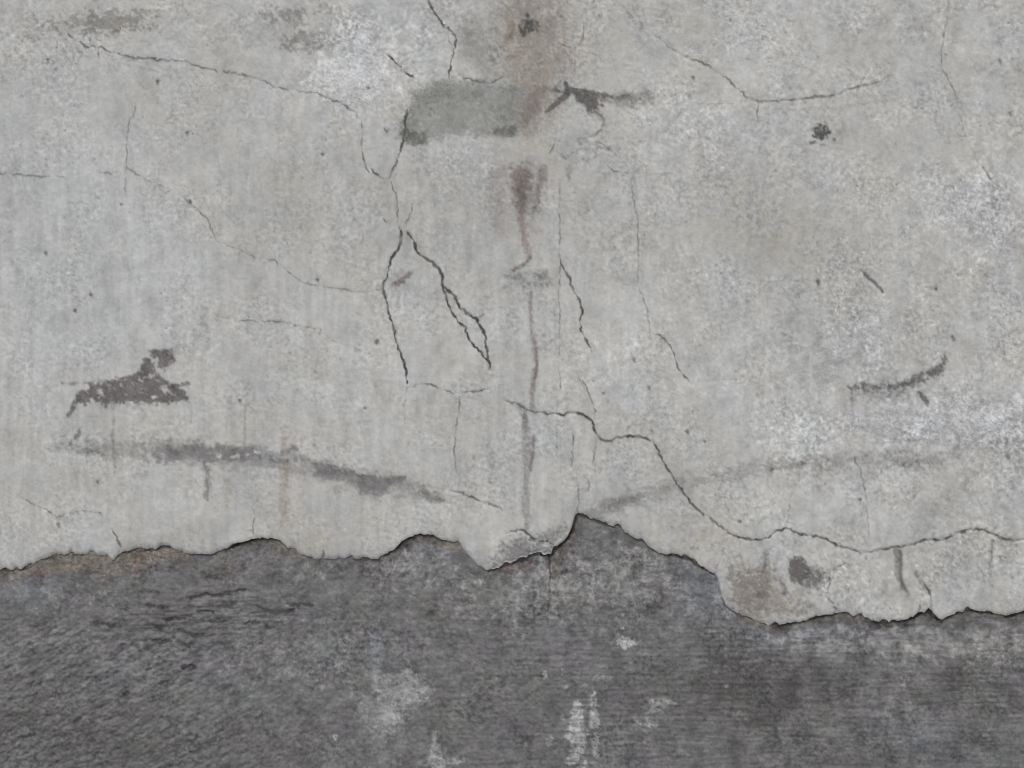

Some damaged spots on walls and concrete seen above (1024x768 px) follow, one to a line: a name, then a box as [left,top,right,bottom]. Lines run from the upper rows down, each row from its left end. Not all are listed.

water stain [400,128,425,145]
crack [382,230,491,392]
crack [561,264,589,345]
spalling [67,350,188,415]
spalling [848,358,947,403]
crack [507,401,1010,552]
spalling [0,545,195,580]
crack [354,534,422,561]
crack [503,517,607,576]
crack [675,555,704,569]
spalling [789,557,829,591]
peeling [581,674,610,768]